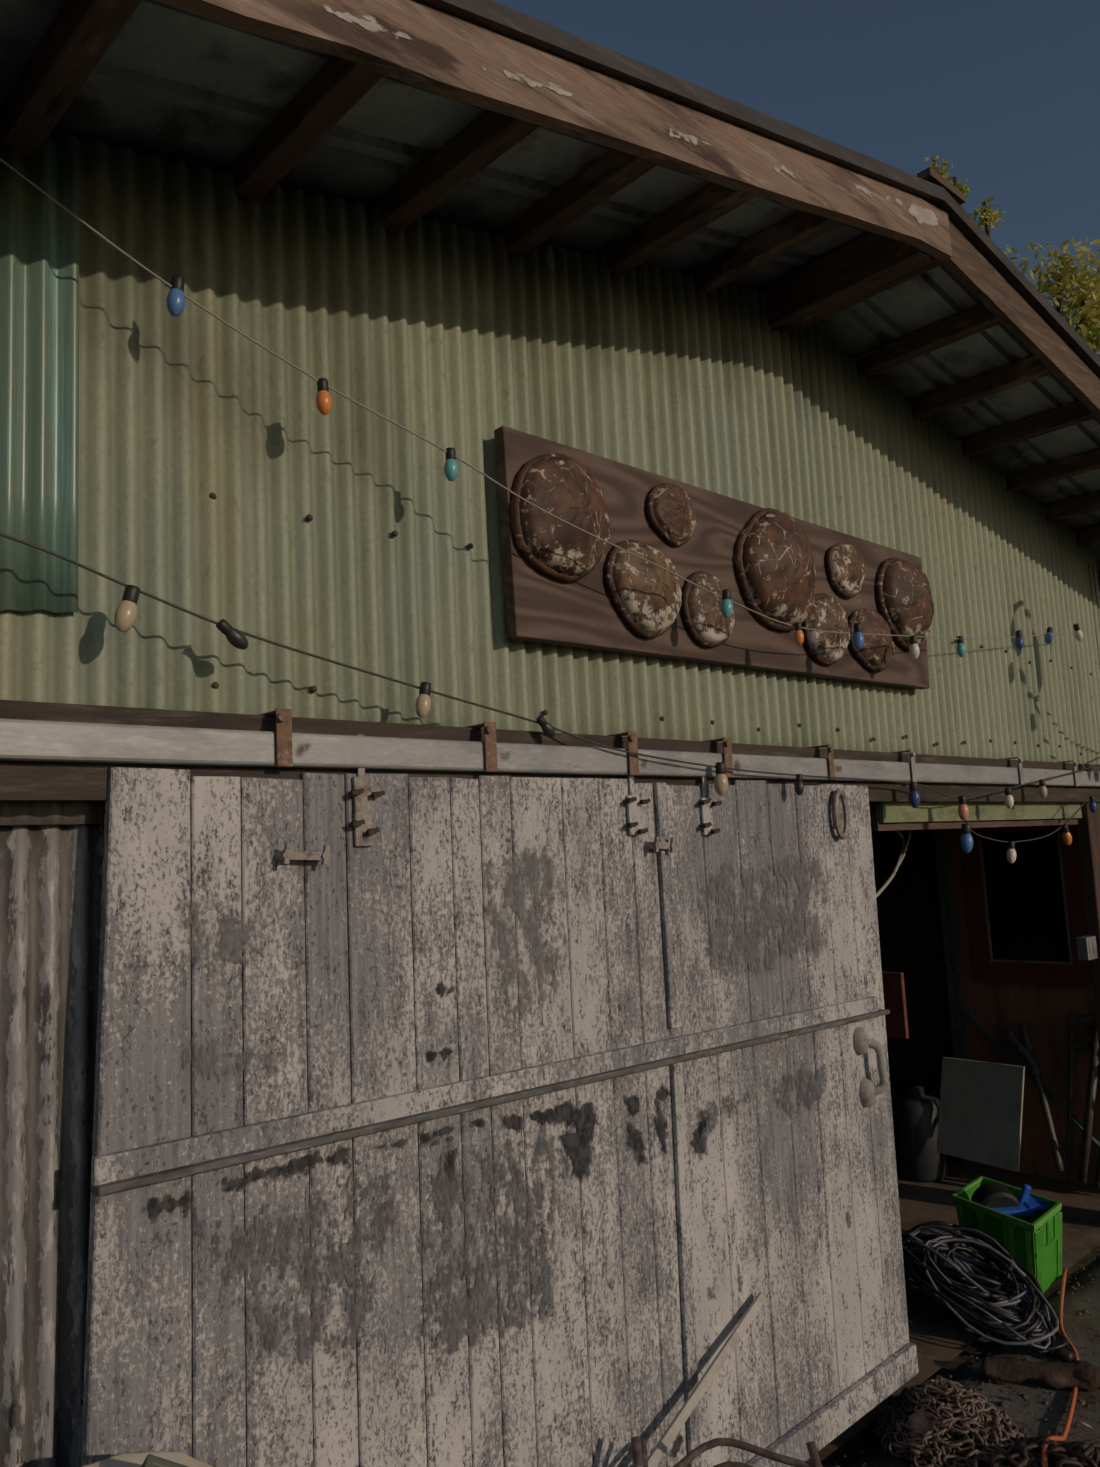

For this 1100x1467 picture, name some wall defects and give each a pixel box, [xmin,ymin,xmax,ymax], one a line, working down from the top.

peeling [178,894,263,974]
peeling [476,840,569,1028]
peeling [436,982,456,997]
peeling [422,1047,453,1062]
peeling [623,1082,687,1165]
peeling [692,1090,753,1159]
peeling [773,1059,827,1124]
peeling [144,1098,599,1375]
peeling [670,1435,689,1467]